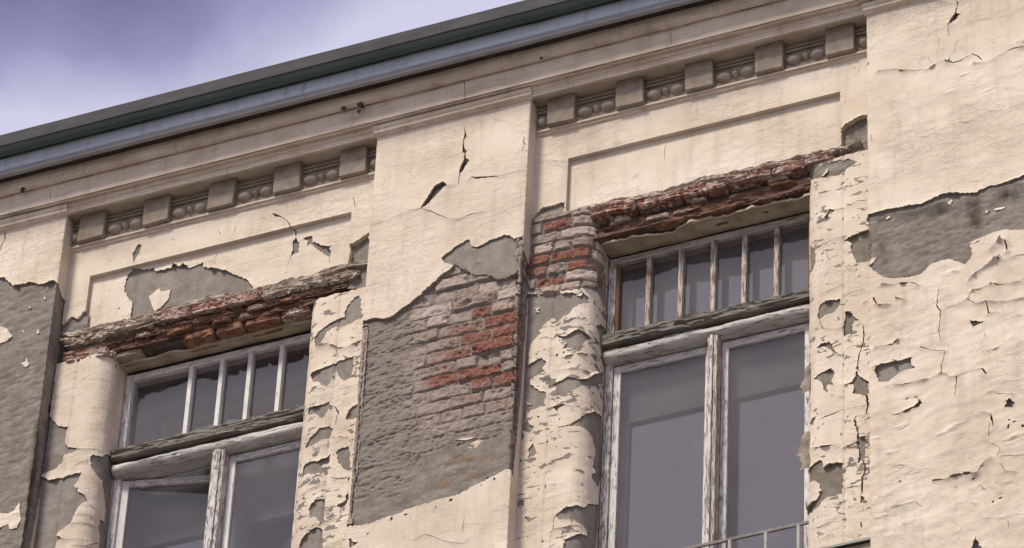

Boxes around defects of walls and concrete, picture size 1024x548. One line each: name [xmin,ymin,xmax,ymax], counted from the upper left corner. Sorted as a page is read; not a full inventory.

crack [424,132,487,216]
peeling [847,177,1024,278]
peeling [125,245,253,318]
peeling [818,299,858,336]
peeling [0,278,114,548]
flaking render [304,200,607,526]
peeling [796,417,843,513]
peeling [799,359,914,396]
peeling [855,421,868,462]
peeling [299,500,325,548]
peeling [557,504,598,548]